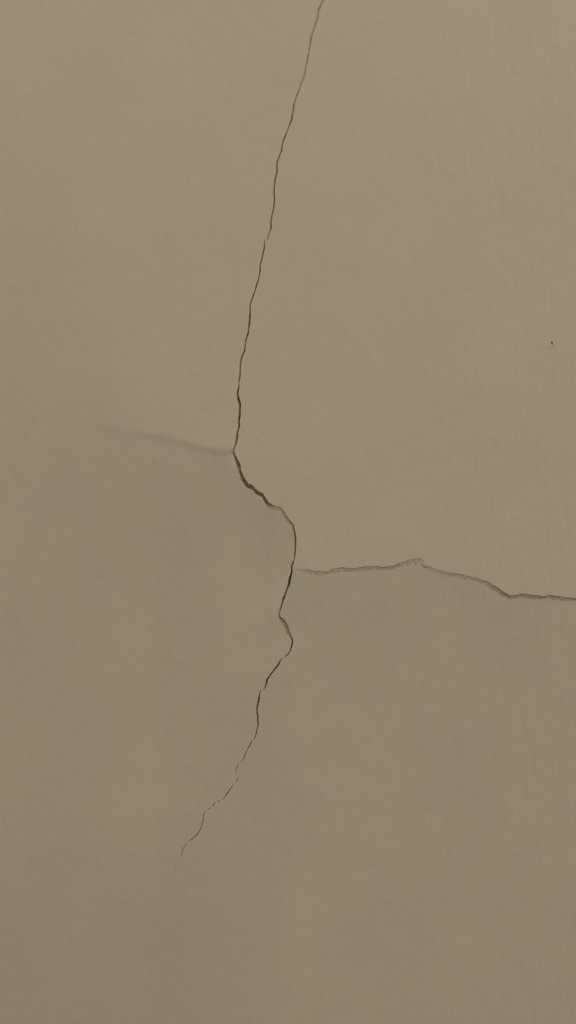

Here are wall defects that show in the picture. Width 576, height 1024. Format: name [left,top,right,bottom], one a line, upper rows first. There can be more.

crack [173,0,576,872]